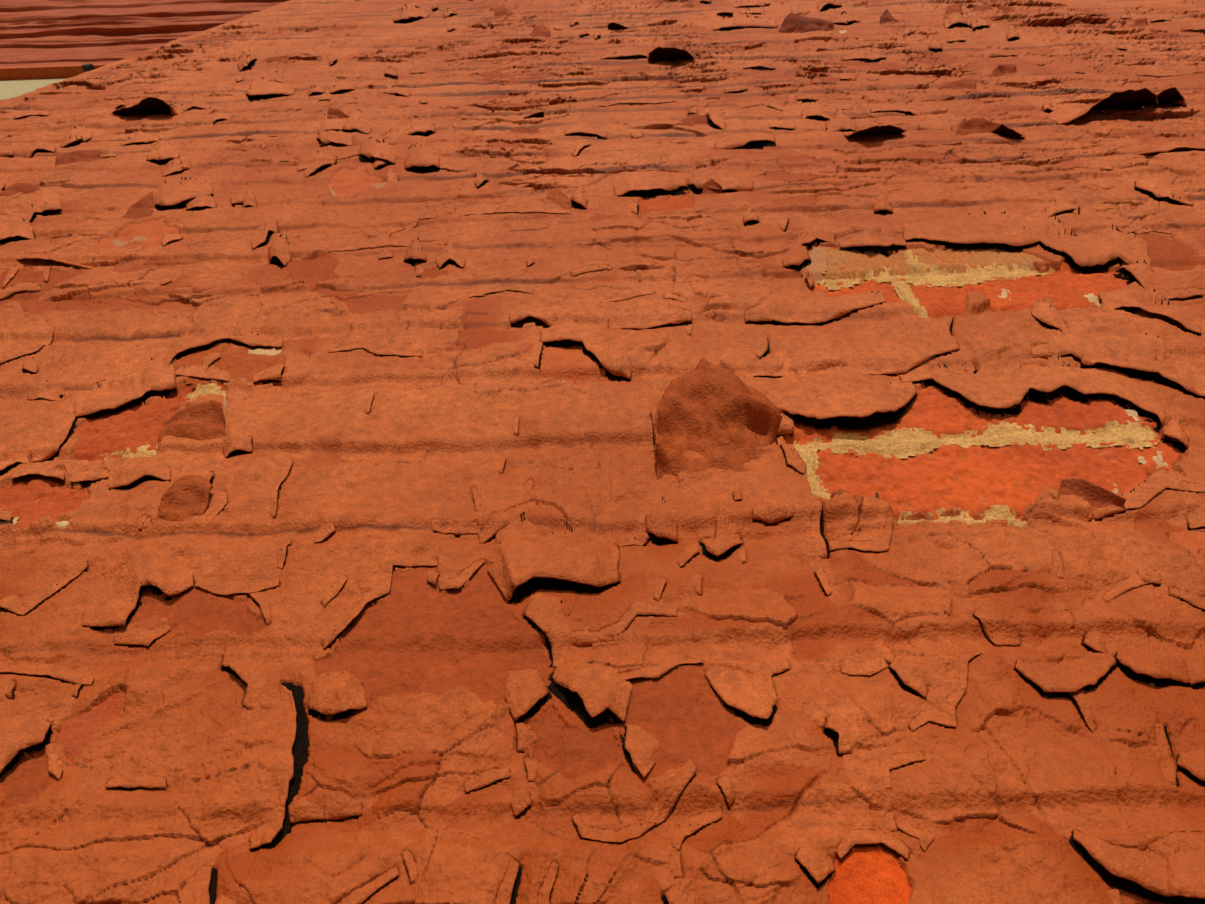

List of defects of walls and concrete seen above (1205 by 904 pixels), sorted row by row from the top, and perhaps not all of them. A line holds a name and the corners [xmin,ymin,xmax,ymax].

crack [70,456,171,491]
flaking render [0,320,286,531]
flaking render [640,210,1205,555]
crack [1031,297,1205,400]
crack [1088,468,1205,522]
crack [572,488,832,648]
crack [221,641,268,711]
peeling [249,510,791,851]
crack [940,568,1205,732]
crack [1145,722,1205,787]
flaking render [795,824,911,904]
flaking render [1069,830,1205,904]